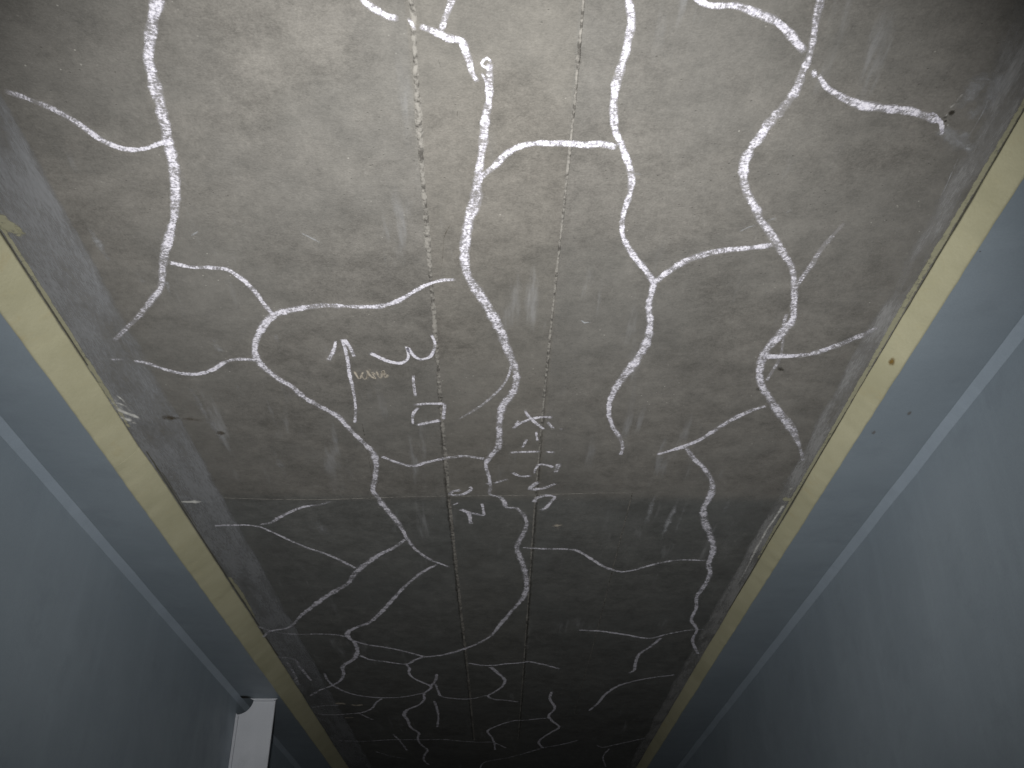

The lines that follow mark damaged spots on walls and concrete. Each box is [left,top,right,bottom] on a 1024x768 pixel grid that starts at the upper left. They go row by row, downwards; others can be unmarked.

crack [41,0,453,404]
crack [216,0,944,766]